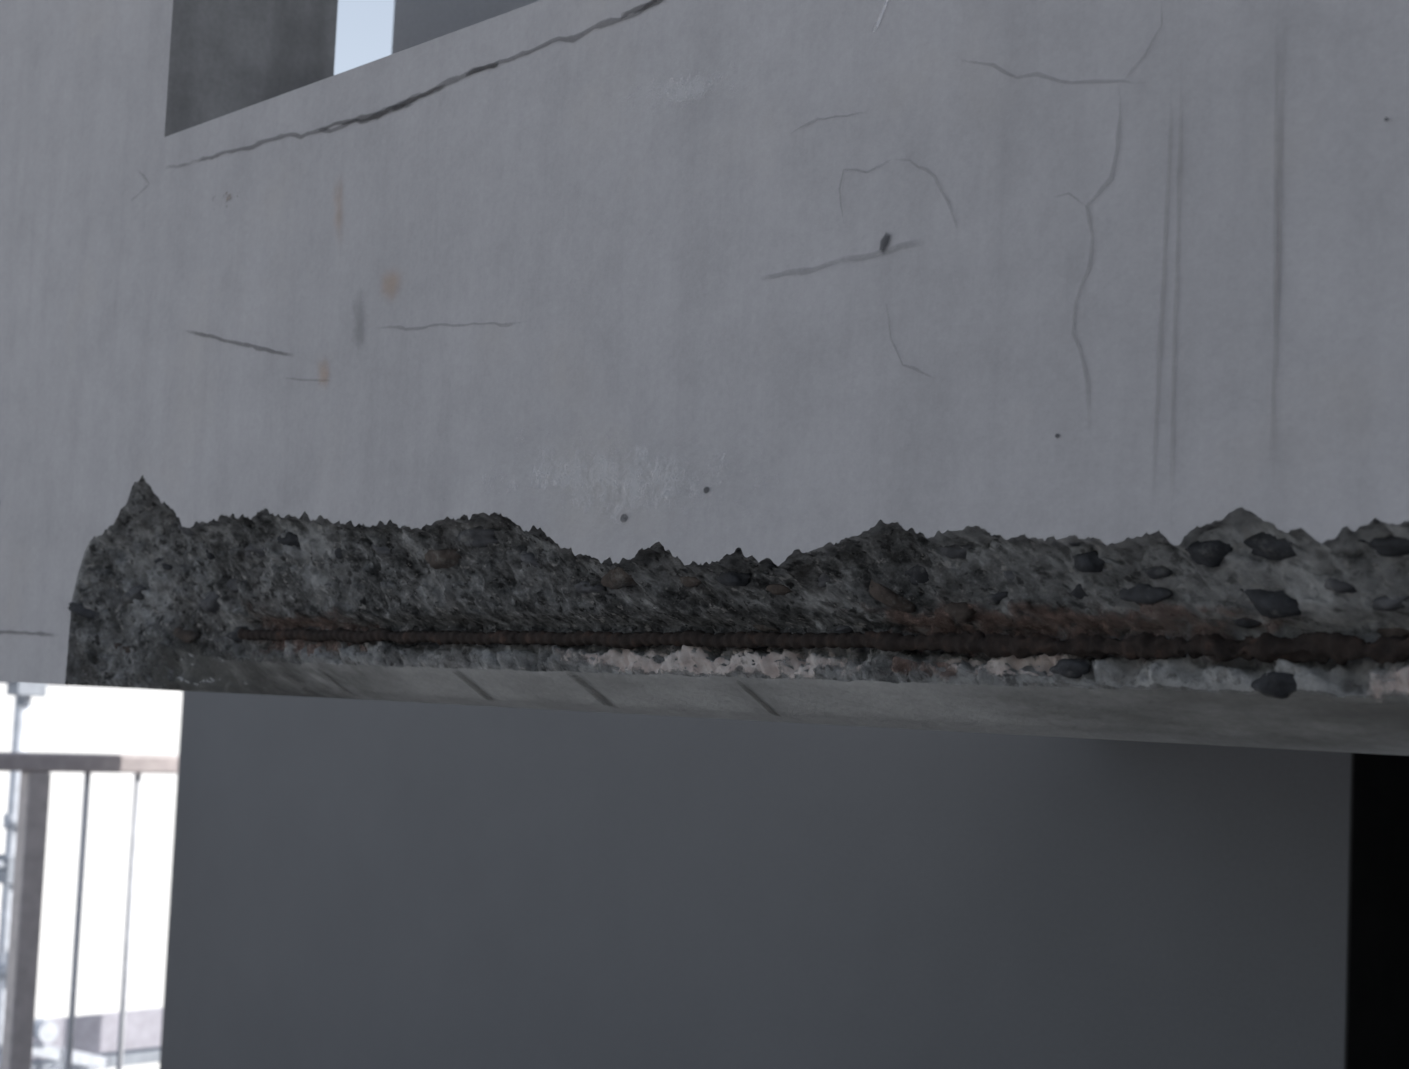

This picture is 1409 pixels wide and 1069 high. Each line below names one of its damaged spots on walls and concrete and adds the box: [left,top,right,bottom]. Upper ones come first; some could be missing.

spalling [65,475,1409,756]